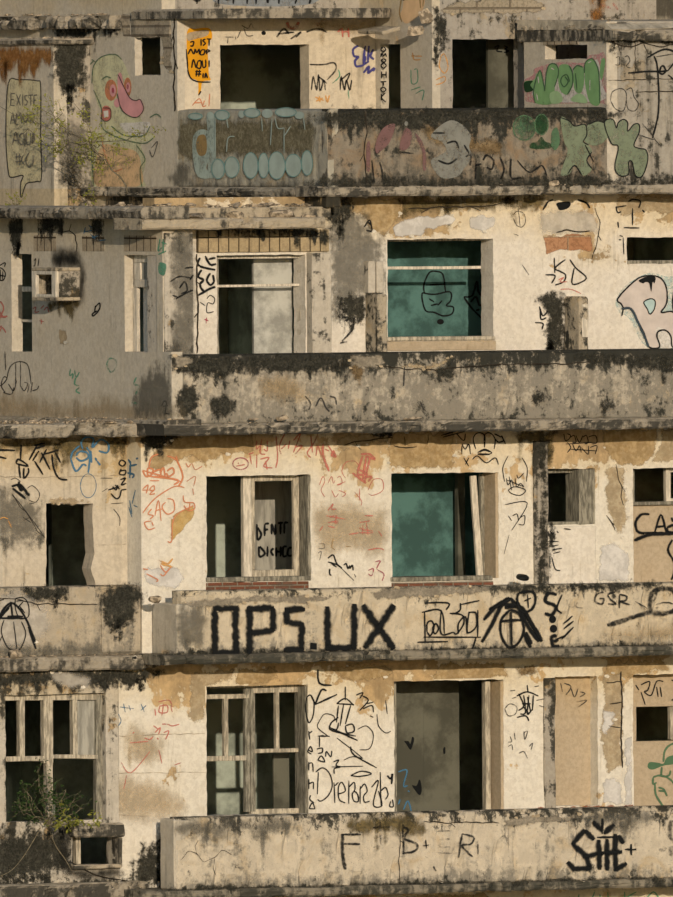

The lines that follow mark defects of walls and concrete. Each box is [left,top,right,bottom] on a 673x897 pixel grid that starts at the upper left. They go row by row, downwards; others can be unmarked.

corrosion [0,46,52,84]
leakage [49,29,119,110]
leakage [308,104,626,142]
peeling [340,197,402,236]
peeling [541,211,597,254]
leakage [133,345,363,419]
peeling [603,428,673,539]
leakage [99,582,143,641]
peeling [188,666,280,723]
peeling [331,664,392,683]
leakage [0,820,344,893]
leakage [347,815,425,849]